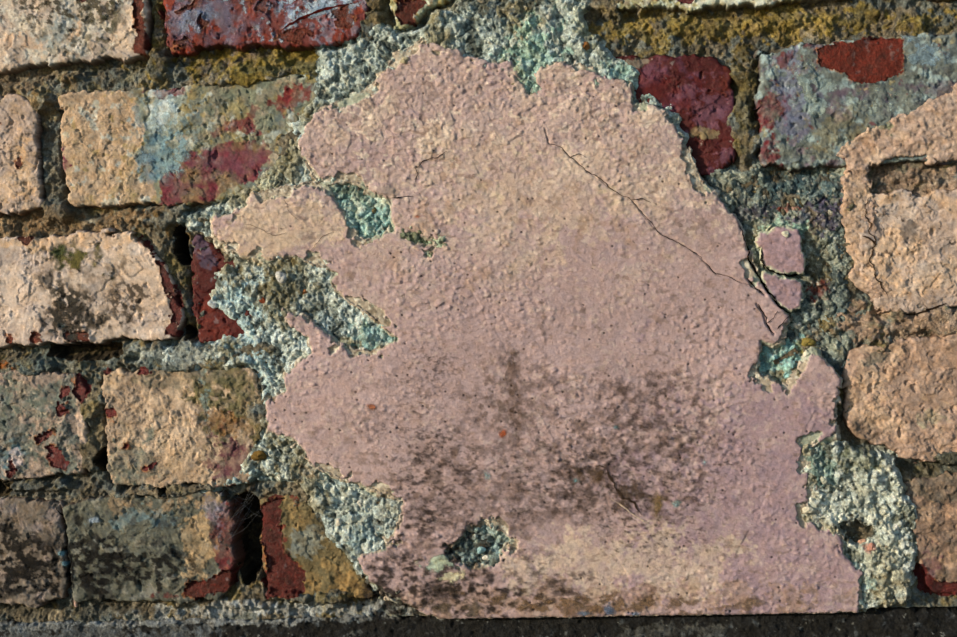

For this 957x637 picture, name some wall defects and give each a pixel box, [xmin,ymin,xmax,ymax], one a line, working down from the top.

peeling [158,0,209,29]
peeling [817,36,904,84]
spalling [173,0,689,257]
crack [545,131,802,334]
spalling [702,157,874,383]
crack [863,198,888,295]
crack [903,303,946,315]
spalling [139,235,403,600]
spalling [450,519,509,569]
spalling [595,465,648,524]
spalling [798,440,957,612]